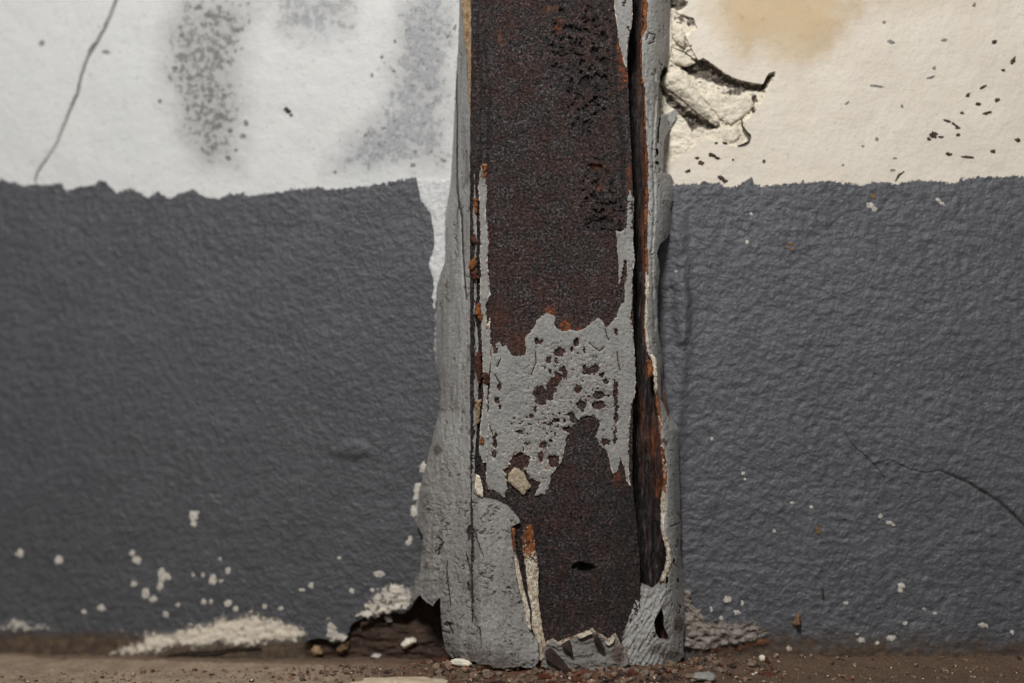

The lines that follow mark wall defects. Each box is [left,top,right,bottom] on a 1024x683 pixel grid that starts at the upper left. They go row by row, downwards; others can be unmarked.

crack [34,0,118,182]
damp [166,0,250,163]
damp [333,0,457,174]
peeling [417,178,451,309]
corrosion [468,257,480,280]
flaking render [639,0,775,584]
corrosion [475,350,490,384]
peeling [508,467,531,495]
crack [847,436,1024,526]
damp [0,610,309,659]
flaking render [301,596,452,660]
peeling [511,524,545,661]